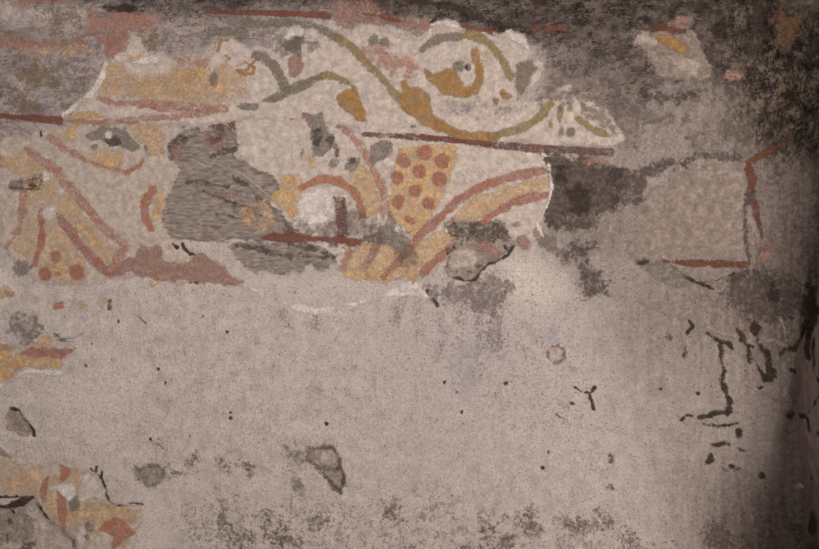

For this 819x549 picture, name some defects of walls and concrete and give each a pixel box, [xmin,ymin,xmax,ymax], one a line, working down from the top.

flaking render [444,218,518,281]
crack [667,262,734,288]
crack [680,320,777,470]
flaking render [5,407,36,437]
crack [0,495,49,519]
crack [90,466,144,507]
leakage [215,498,253,549]
leakage [260,508,303,549]
flaking render [286,444,346,495]
leakage [461,503,543,549]
leakage [564,508,614,536]